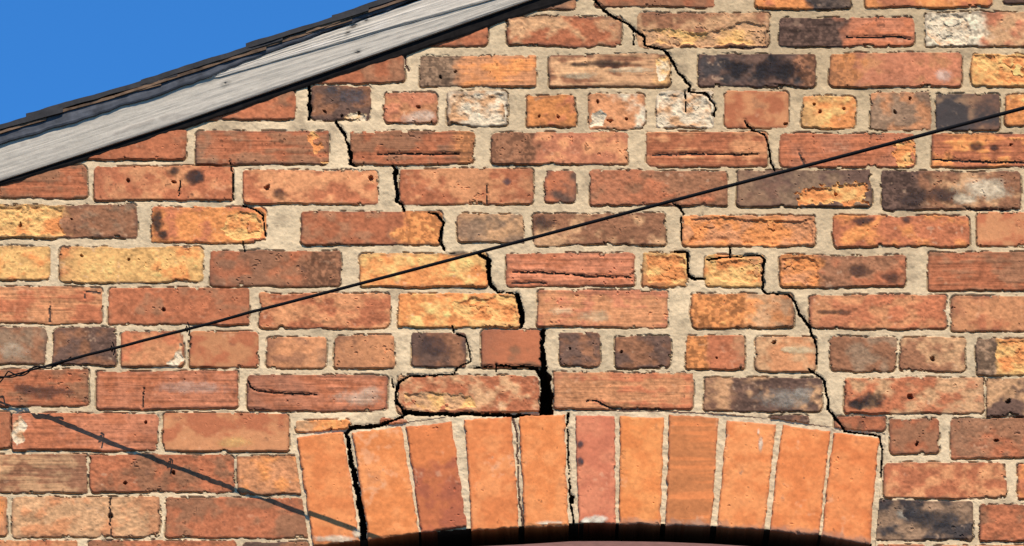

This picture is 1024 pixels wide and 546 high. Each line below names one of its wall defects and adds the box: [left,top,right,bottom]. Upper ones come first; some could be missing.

crack [593,0,717,117]
crack [729,43,768,51]
crack [307,86,460,251]
crack [652,120,775,172]
crack [344,253,665,546]
crack [672,203,884,478]